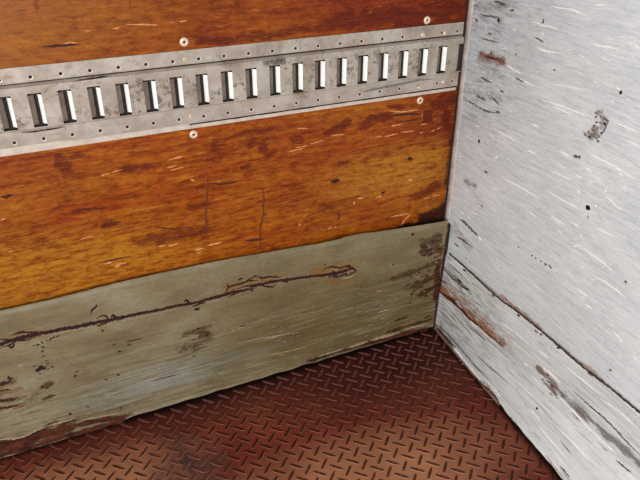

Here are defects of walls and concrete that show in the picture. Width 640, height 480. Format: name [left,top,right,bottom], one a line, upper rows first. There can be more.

corrosion [480,52,505,71]
peeling [583,110,609,142]
crack [245,185,266,245]
crack [0,264,356,349]
peeling [535,365,565,399]